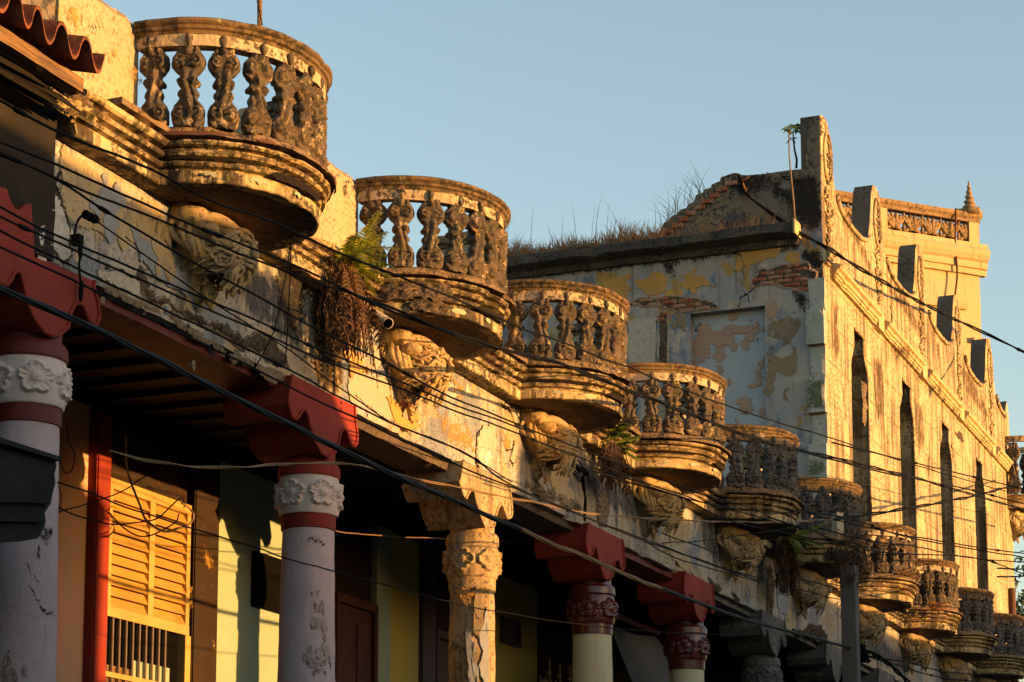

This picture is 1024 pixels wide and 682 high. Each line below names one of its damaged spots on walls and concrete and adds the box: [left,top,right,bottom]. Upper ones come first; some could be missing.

damp [721,155,823,231]
peeling [34,144,290,385]
flaking render [734,248,818,292]
peeling [601,269,801,424]
damp [890,288,941,358]
damp [874,359,886,417]
damp [958,361,987,427]
damp [914,404,930,490]
crack [27,563,55,654]